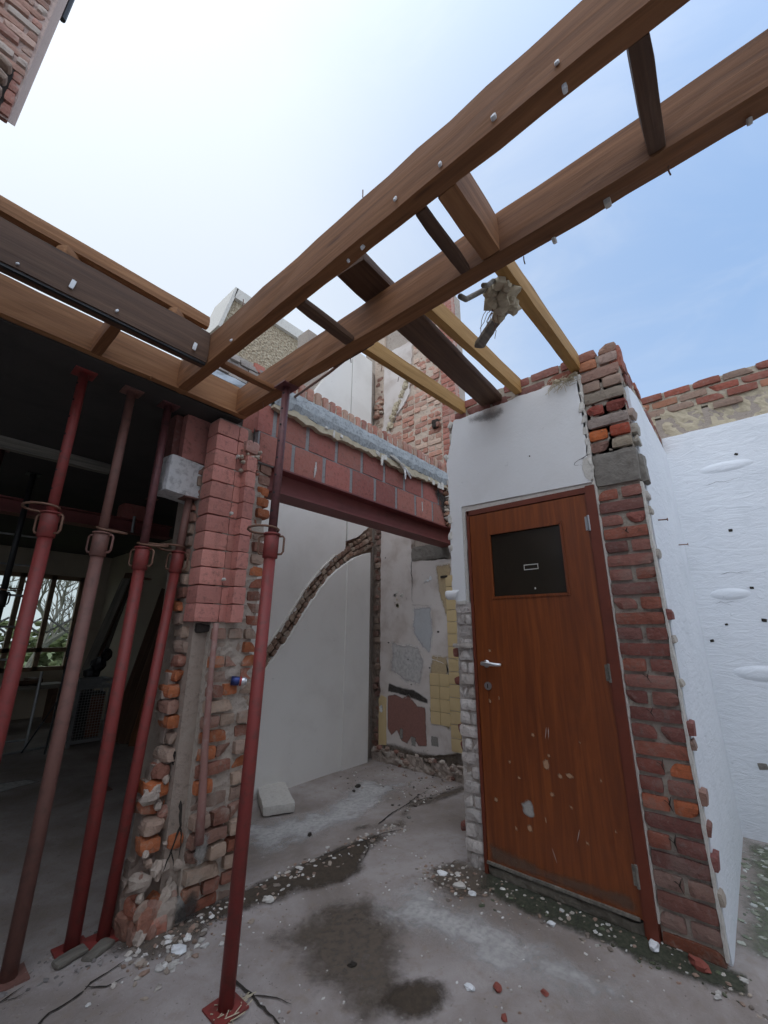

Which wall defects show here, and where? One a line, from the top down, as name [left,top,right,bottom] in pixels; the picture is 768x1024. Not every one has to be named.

flaking render [177,451,272,912]
damp [293,891,595,1019]